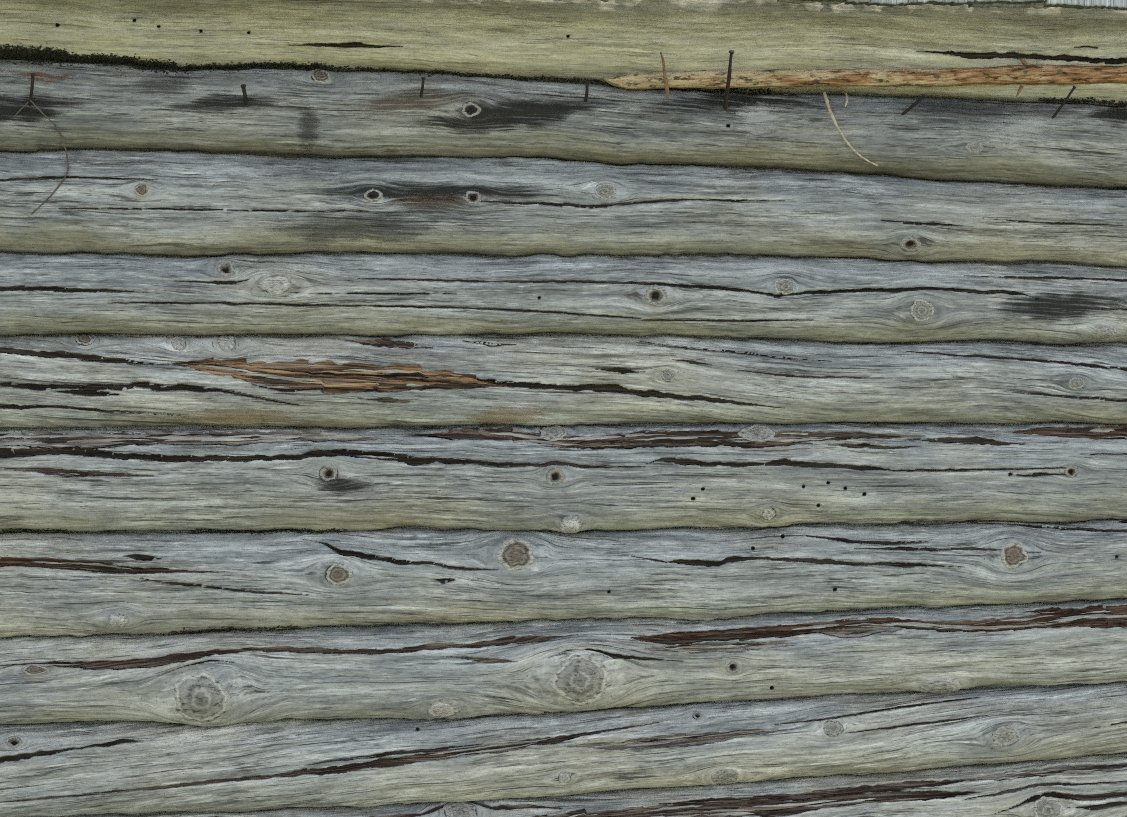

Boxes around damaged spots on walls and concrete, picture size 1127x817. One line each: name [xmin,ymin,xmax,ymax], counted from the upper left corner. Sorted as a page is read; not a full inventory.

water stain [372,89,618,134]
crack [0,275,1127,378]
crack [0,347,781,417]
crack [1014,392,1127,402]
crack [0,436,1071,477]
crack [370,802,563,817]